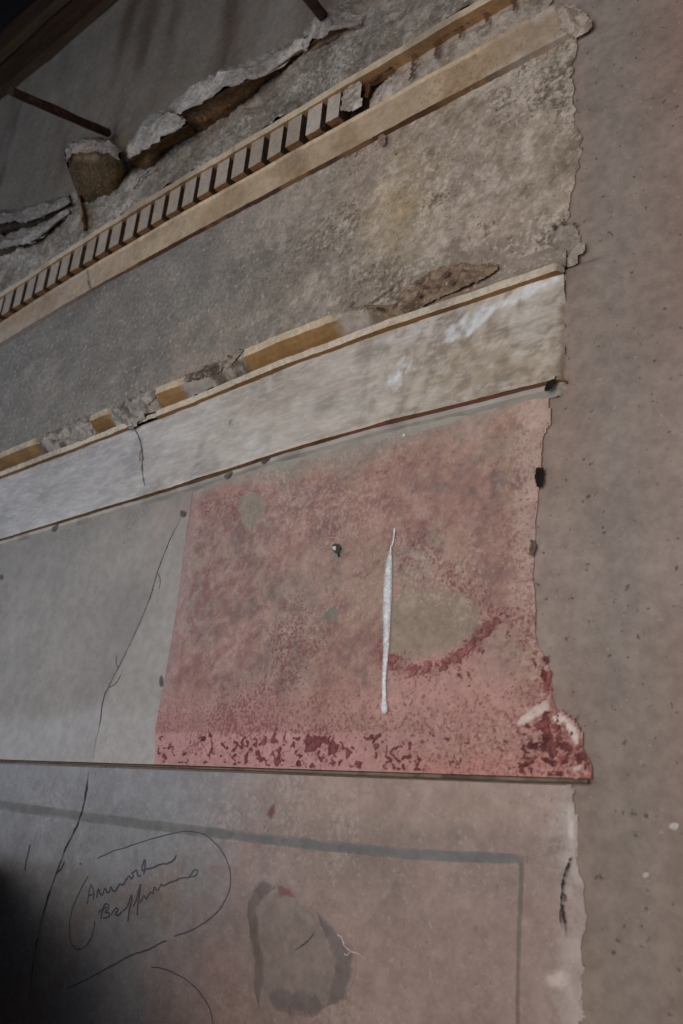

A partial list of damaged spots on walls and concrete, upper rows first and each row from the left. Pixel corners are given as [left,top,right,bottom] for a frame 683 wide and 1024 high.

flaking render [346,262,498,317]
crack [133,428,145,486]
crack [29,516,182,1000]
peeling [157,728,448,771]
crack [559,856,572,937]